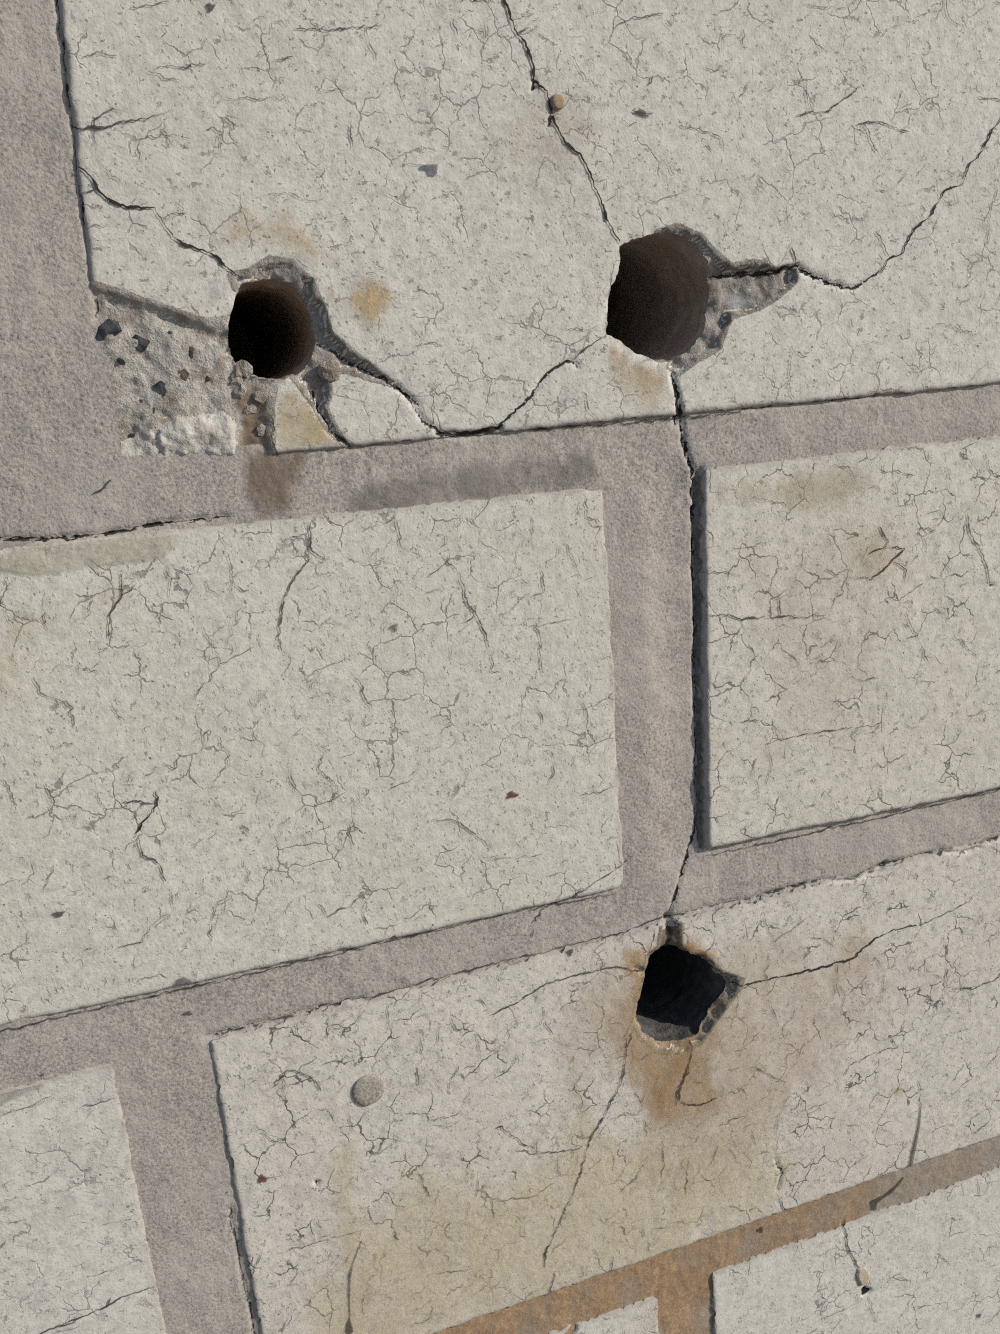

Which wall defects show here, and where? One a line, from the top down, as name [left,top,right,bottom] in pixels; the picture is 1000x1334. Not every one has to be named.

crack [78,163,243,280]
spalling [92,255,395,459]
crack [315,294,613,436]
crack [423,0,689,243]
spalling [655,223,800,376]
crack [696,0,1000,398]
crack [0,499,627,967]
crack [663,373,1000,944]
crack [241,860,1000,1317]
corrosion [623,951,713,1117]
spalling [632,921,745,1055]
corrosion [434,1178,878,1334]